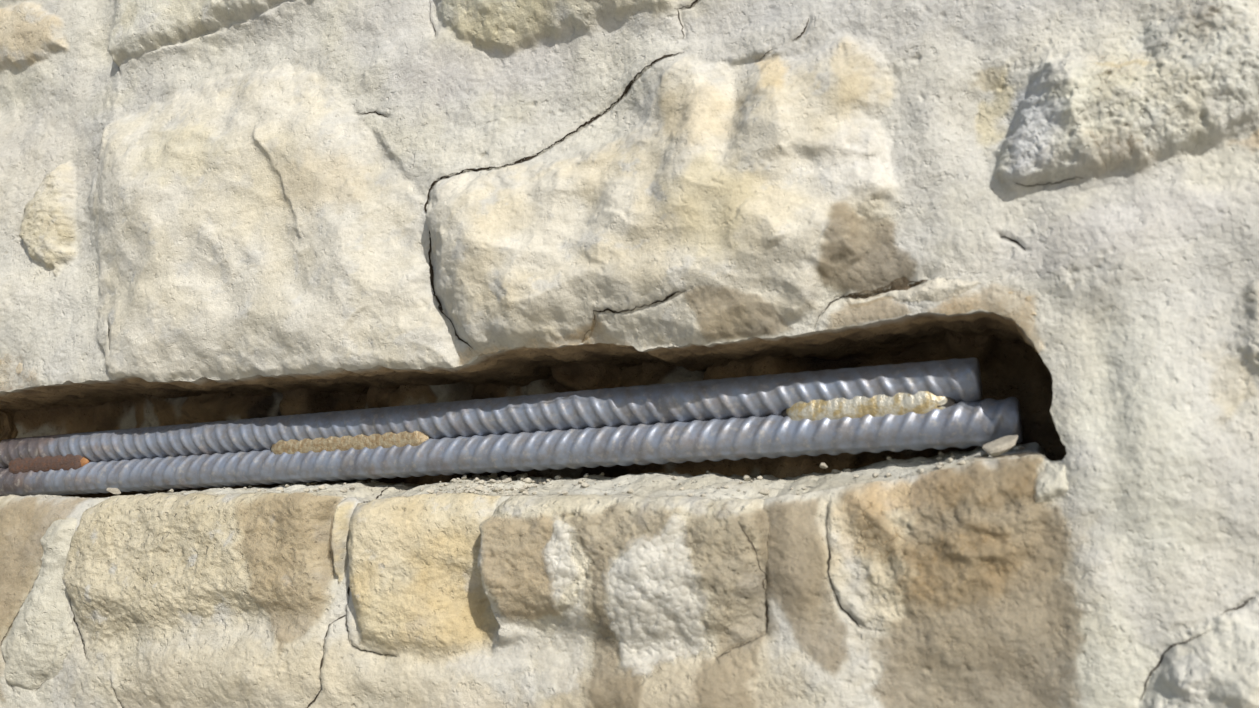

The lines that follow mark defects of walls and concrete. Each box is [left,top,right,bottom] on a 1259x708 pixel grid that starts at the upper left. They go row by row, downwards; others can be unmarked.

crack [424,0,698,348]
spalling [982,435,1018,457]
crack [307,587,397,708]